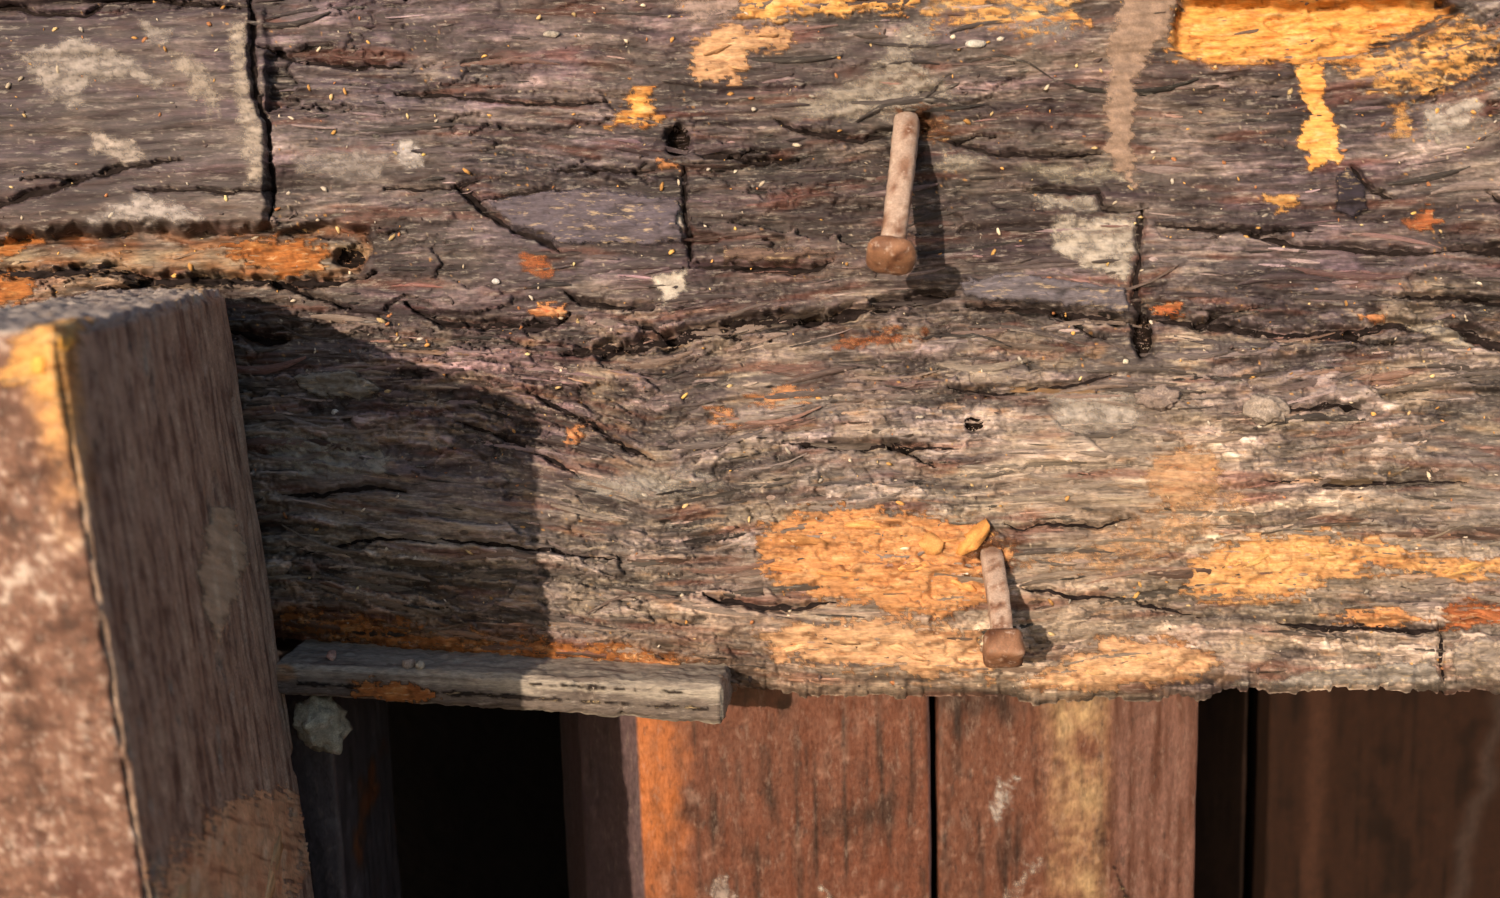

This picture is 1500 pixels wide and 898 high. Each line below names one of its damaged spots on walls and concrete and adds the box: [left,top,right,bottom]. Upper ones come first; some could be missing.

peeling [703,44,747,71]
crack [0,0,608,221]
rust [0,233,46,306]
crack [0,266,377,310]
rust [208,232,331,280]
crack [385,120,1500,397]
crack [230,330,291,346]
rust [963,529,1020,582]
peeling [950,579,977,592]
rust [279,604,697,665]
rust [350,675,443,704]